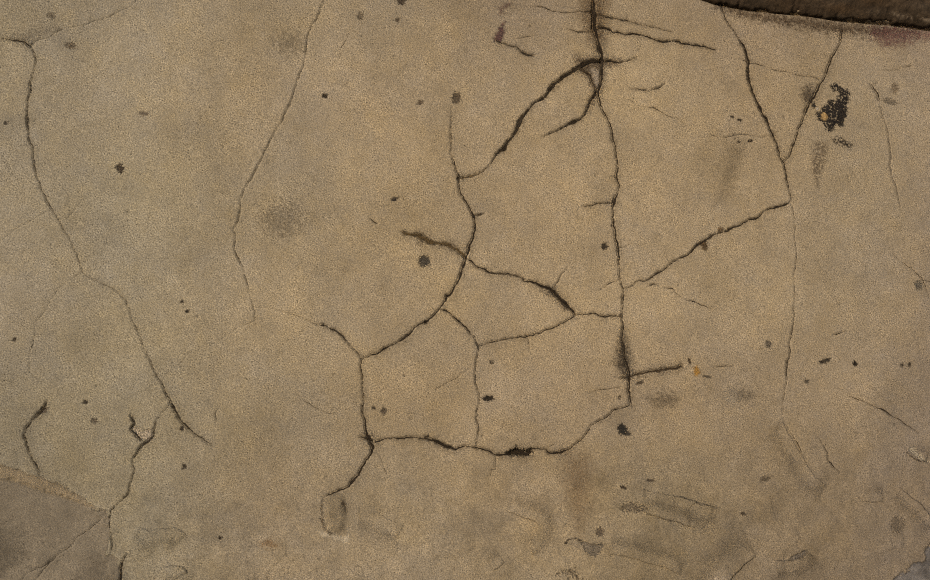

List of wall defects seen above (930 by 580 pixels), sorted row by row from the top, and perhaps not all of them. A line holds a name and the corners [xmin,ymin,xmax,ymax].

crack [3,38,53,210]
crack [293,0,843,495]
crack [23,360,212,580]